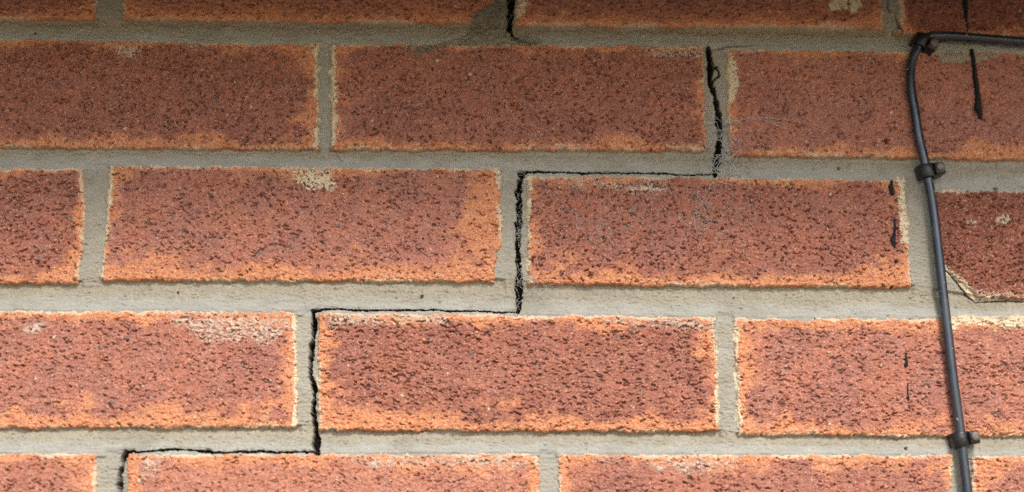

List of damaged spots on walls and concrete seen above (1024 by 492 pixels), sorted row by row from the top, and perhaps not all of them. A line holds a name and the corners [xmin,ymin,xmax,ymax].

crack [506,0,519,41]
crack [118,45,752,486]
spalling [945,265,999,301]